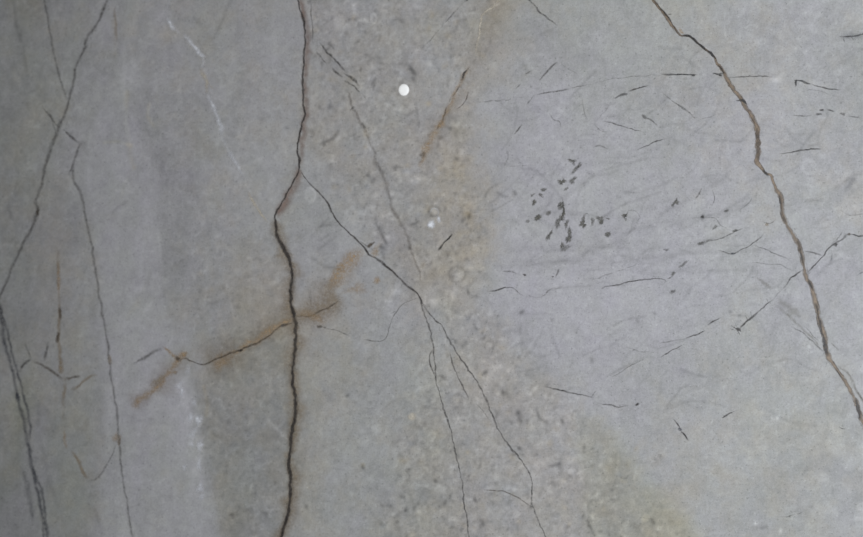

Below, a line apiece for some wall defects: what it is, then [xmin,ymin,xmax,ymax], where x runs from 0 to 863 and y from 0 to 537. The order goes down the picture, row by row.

crack [274,0,543,537]
crack [652,0,863,424]
crack [25,431,47,531]